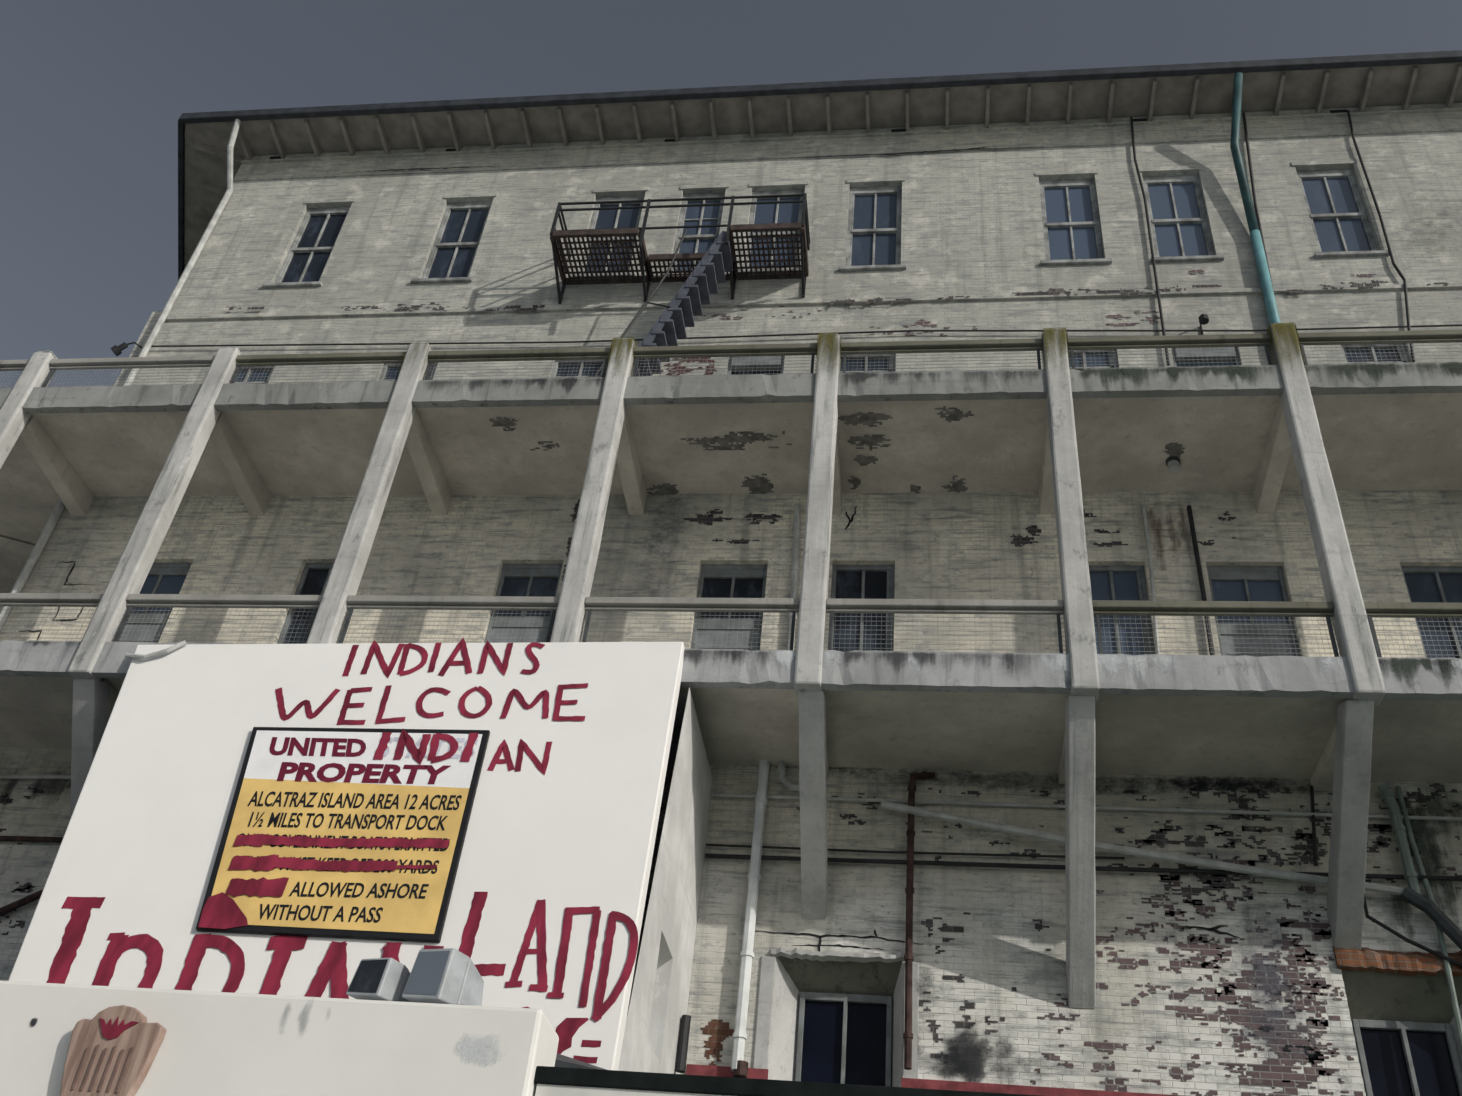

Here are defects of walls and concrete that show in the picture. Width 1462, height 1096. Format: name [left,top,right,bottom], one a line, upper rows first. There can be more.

peeling [680,431,792,450]
peeling [838,412,893,489]
peeling [935,406,974,423]
peeling [741,474,775,494]
peeling [682,509,782,544]
peeling [832,793,880,825]
peeling [1365,783,1462,890]
peeling [0,882,35,935]
peeling [921,912,970,954]
spalling [1085,780,1363,1096]
leakage [933,1024,1015,1083]
peeling [1031,993,1080,1085]